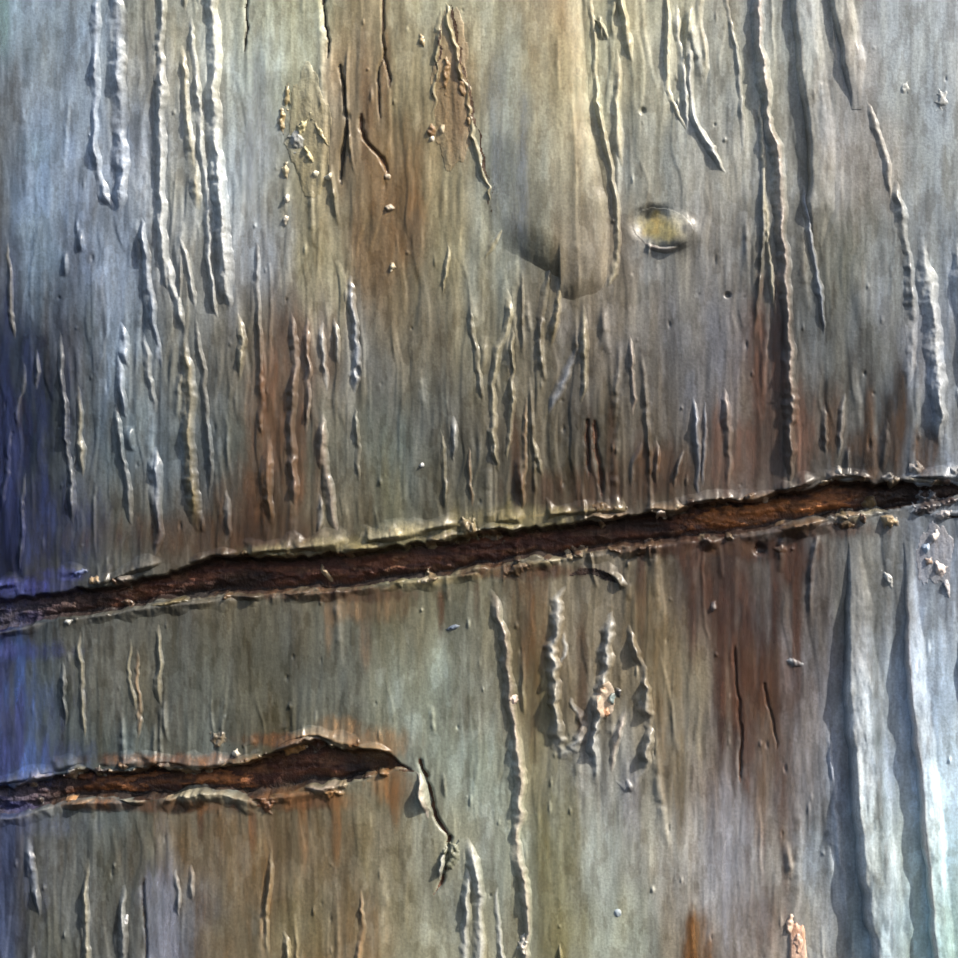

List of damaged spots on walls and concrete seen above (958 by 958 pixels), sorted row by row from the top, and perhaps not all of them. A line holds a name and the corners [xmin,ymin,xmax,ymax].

crack [0,420,958,641]
crack [0,721,463,895]
corrosion [685,918,711,958]
spalling [785,914,807,958]